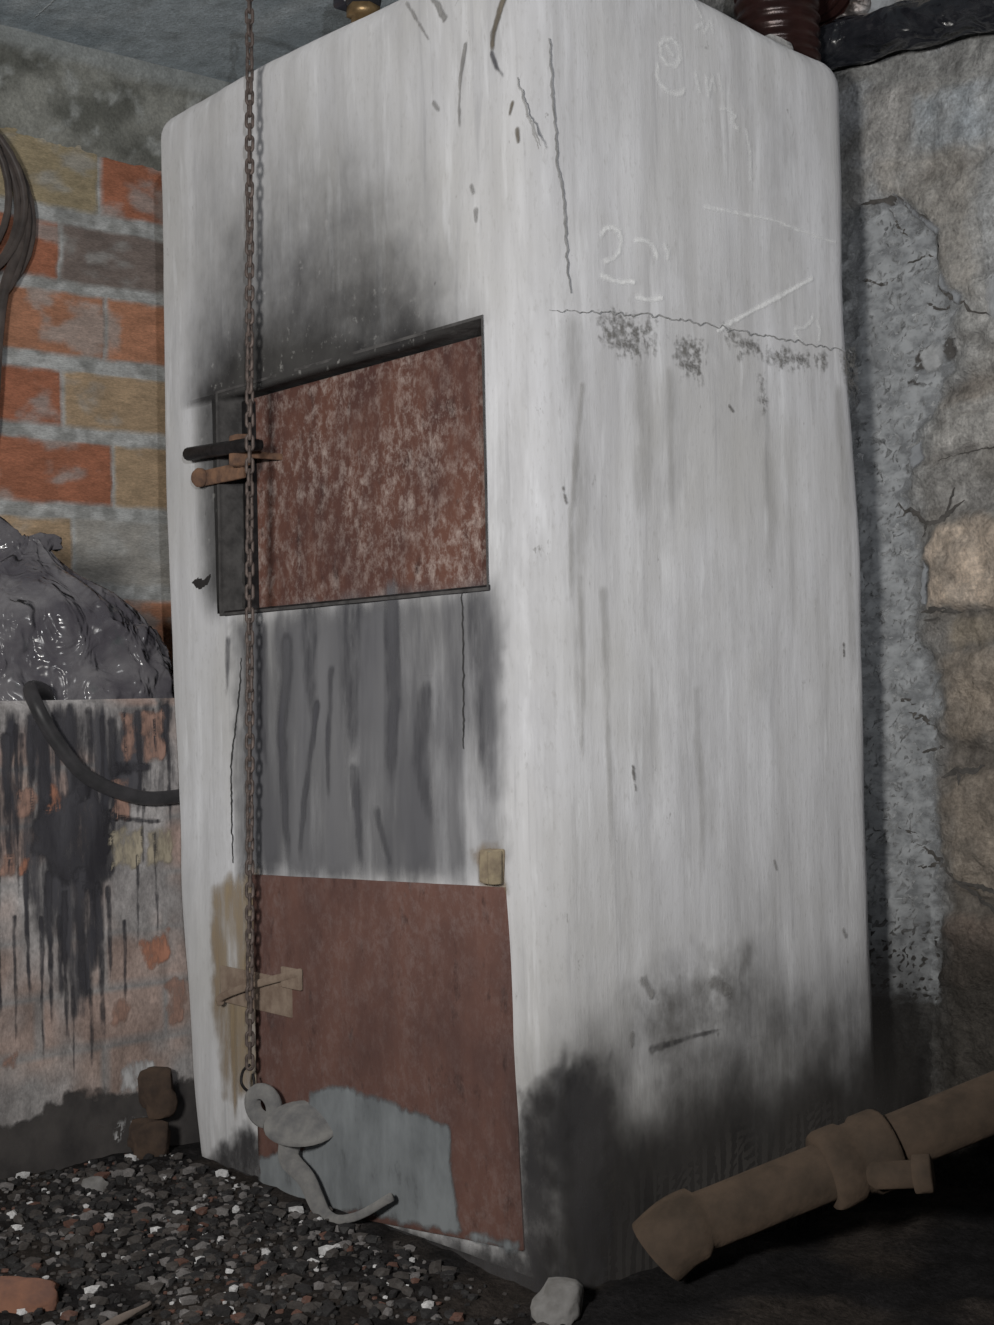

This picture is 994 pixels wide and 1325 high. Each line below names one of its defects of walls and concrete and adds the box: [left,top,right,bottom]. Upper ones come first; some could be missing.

crack [861,195,991,316]
crack [897,446,994,537]
crack [921,606,963,622]
damp [260,604,359,843]
damp [384,582,399,772]
crack [901,698,985,786]
damp [353,767,386,855]
damp [0,704,171,1057]